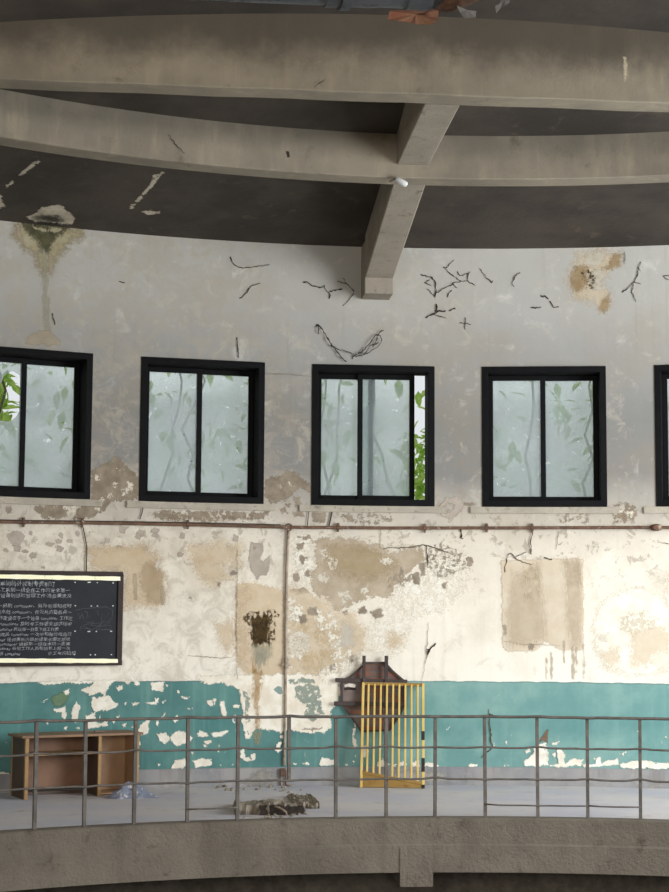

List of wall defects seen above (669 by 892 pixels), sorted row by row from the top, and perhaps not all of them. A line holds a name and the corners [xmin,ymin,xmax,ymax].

spalling [0,161,40,207]
spalling [130,172,164,215]
water stain [13,223,84,346]
water stain [568,251,622,313]
peeling [120,471,326,540]
peeling [341,512,393,525]
spalling [3,531,45,569]
water stain [189,542,364,677]
water stain [501,558,669,678]
peeling [38,530,474,769]
spalling [524,729,669,769]